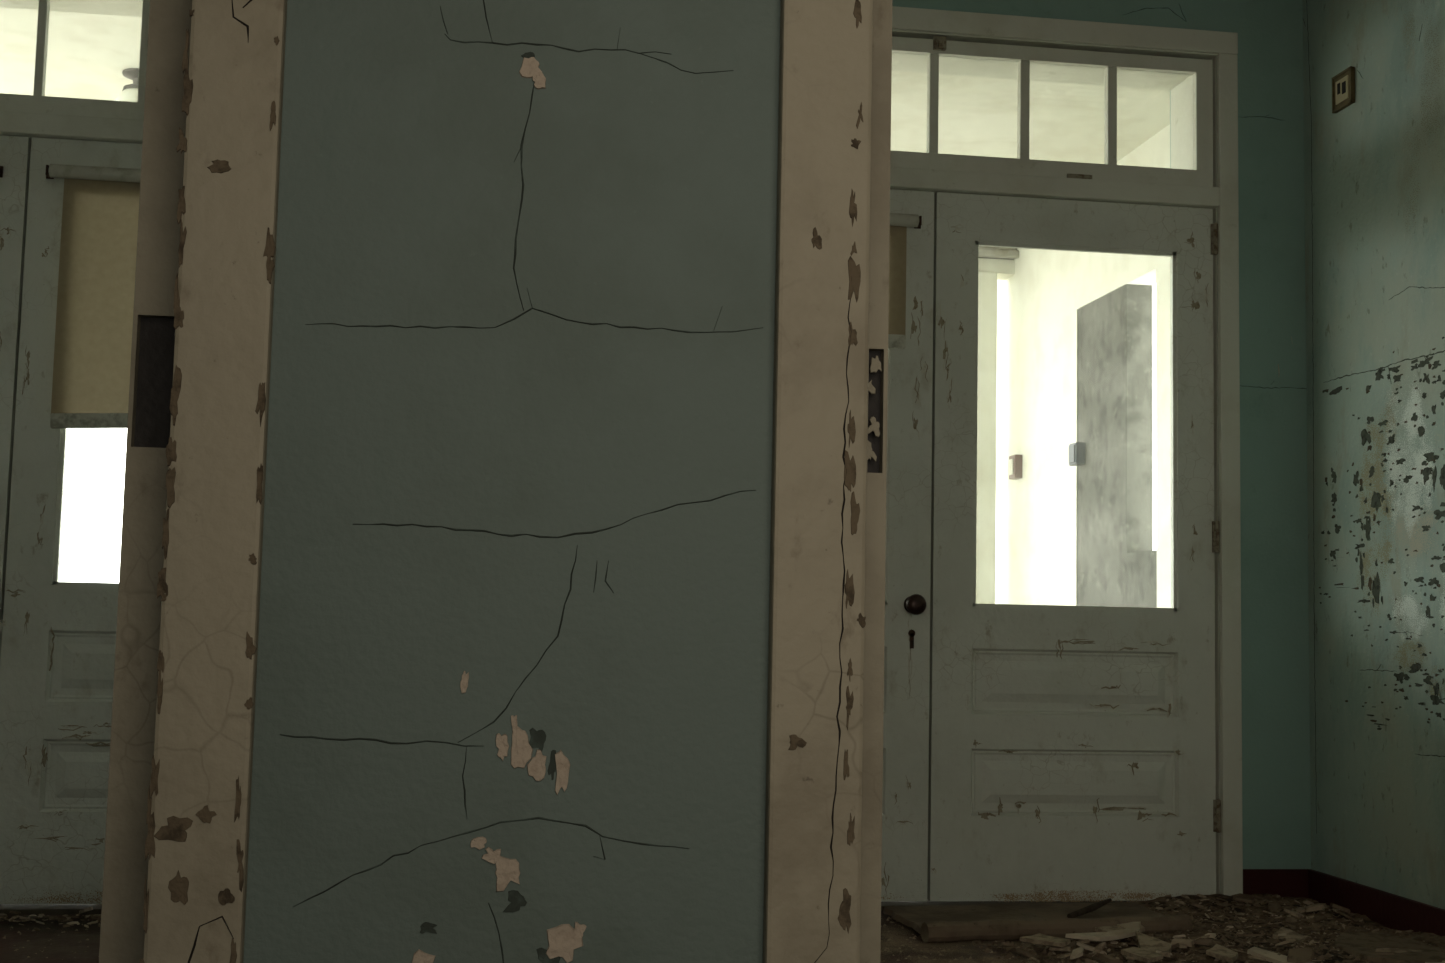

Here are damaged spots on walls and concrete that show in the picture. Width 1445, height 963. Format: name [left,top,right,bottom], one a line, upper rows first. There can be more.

spalling [173,186,187,330]
spalling [848,190,861,303]
spalling [157,365,182,601]
spalling [844,410,860,535]
peeling [1319,337,1445,730]
spalling [845,569,866,628]
flaking render [495,715,570,795]
spalling [143,756,217,933]
spalling [218,839,244,905]
flaking render [470,837,527,912]
flaking render [536,922,587,963]
spalling [838,888,851,933]